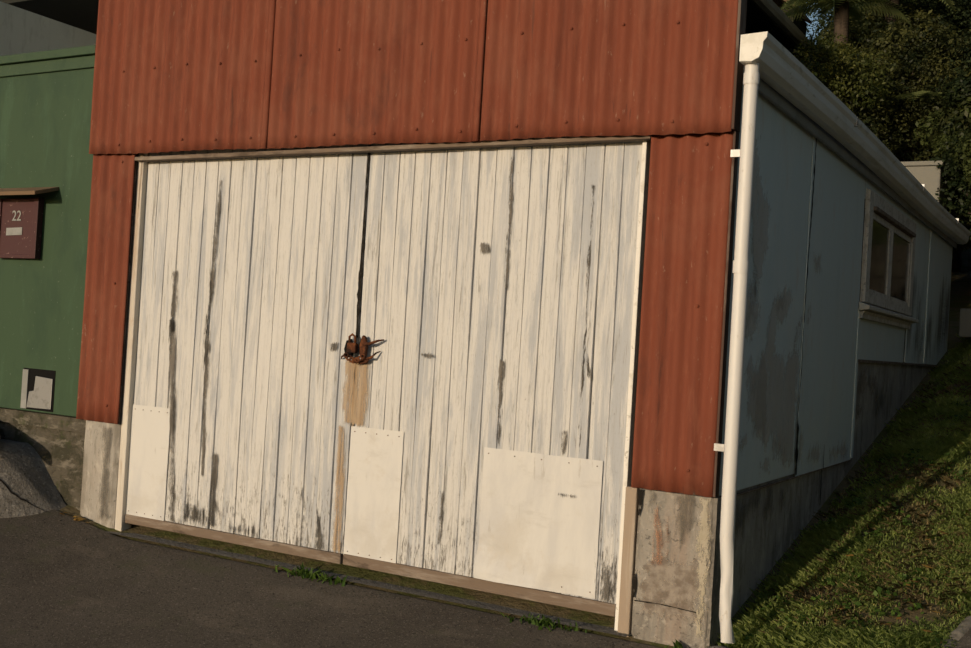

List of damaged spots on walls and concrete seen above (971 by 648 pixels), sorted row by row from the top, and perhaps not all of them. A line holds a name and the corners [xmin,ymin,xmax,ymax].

peeling [740,139,802,475]
crack [0,479,47,512]
leakage [178,499,207,526]
leakage [314,512,329,551]
leakage [735,487,785,536]